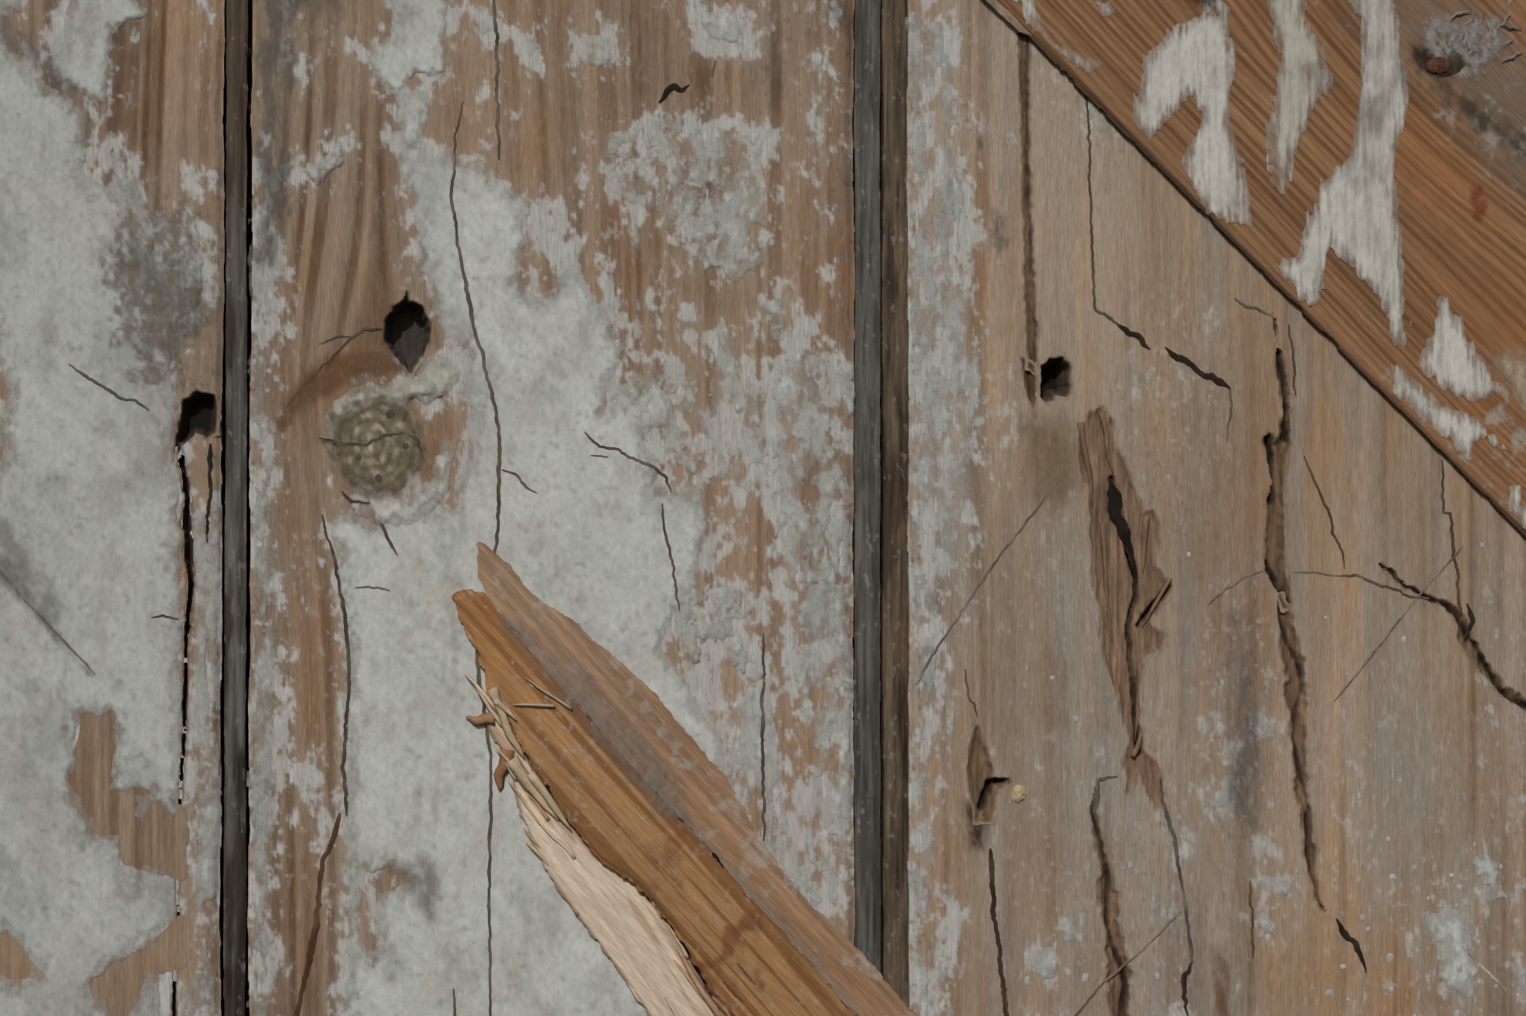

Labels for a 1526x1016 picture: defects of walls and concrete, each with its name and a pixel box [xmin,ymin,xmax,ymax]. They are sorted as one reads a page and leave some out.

peeling [0,0,221,1016]
crack [151,443,213,810]
crack [449,0,537,554]
peeling [334,0,855,1016]
peeling [1133,0,1248,225]
peeling [1266,0,1332,192]
crack [1085,96,1526,973]
peeling [1282,0,1409,345]
peeling [1394,299,1505,460]
crack [170,969,179,1016]
crack [988,848,1009,1016]
crack [1088,776,1135,1016]